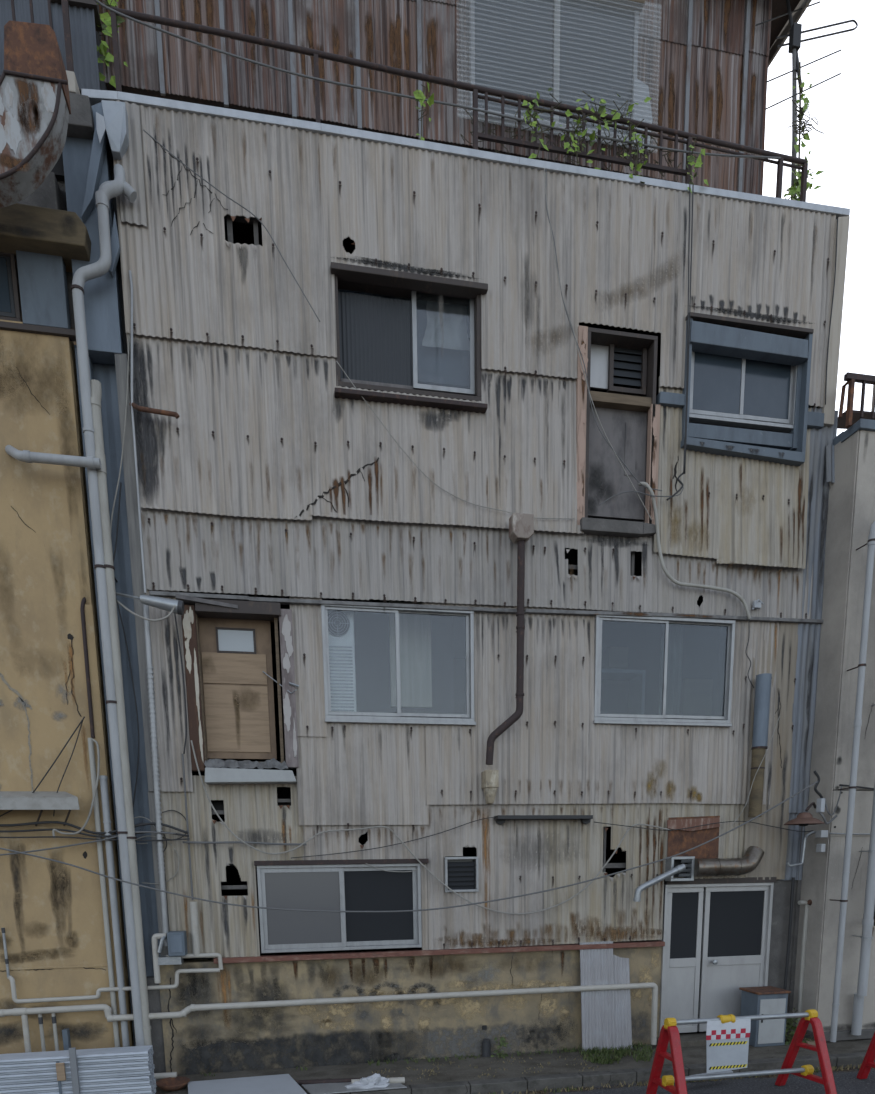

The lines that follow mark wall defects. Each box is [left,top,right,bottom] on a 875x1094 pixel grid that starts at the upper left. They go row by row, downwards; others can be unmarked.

corrosion [15,79,39,132]
corrosion [0,155,29,171]
corrosion [329,471,351,515]
corrosion [368,442,382,511]
corrosion [701,472,710,537]
corrosion [780,478,805,555]
crack [65,637,82,717]
crack [0,673,33,791]
corrosion [470,791,490,869]
leakage [179,967,574,1075]